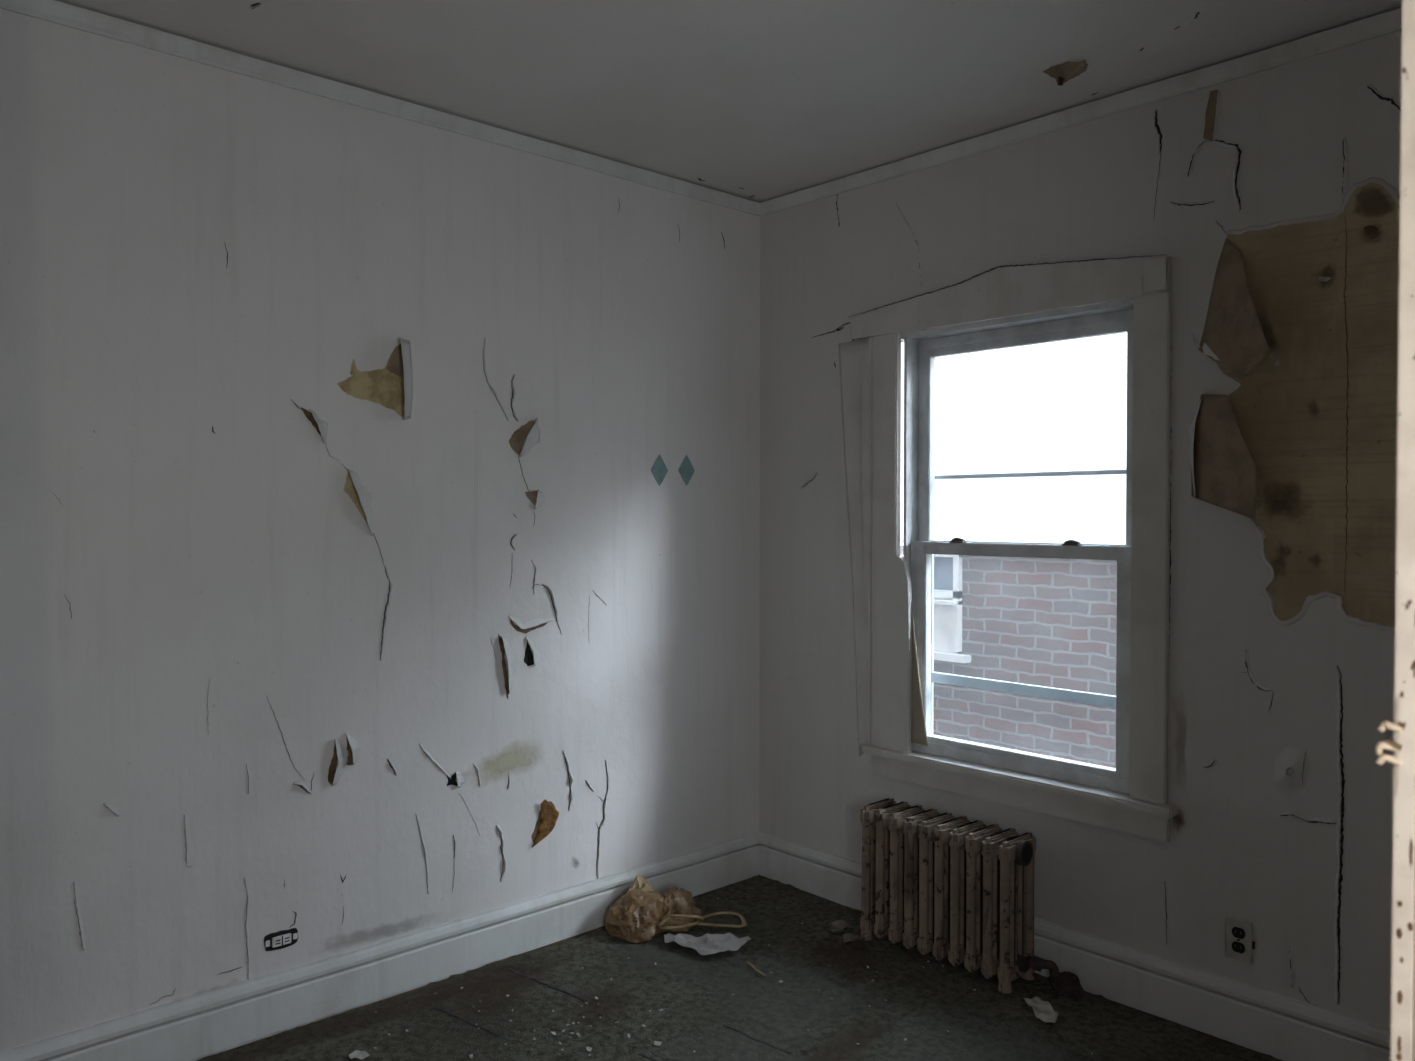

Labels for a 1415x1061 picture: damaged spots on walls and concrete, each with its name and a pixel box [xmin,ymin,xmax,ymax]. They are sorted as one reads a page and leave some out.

peeling [1043,60,1088,86]
crack [1153,110,1242,234]
crack [813,254,1167,368]
crack [562,751,609,879]
crack [1279,665,1345,1005]